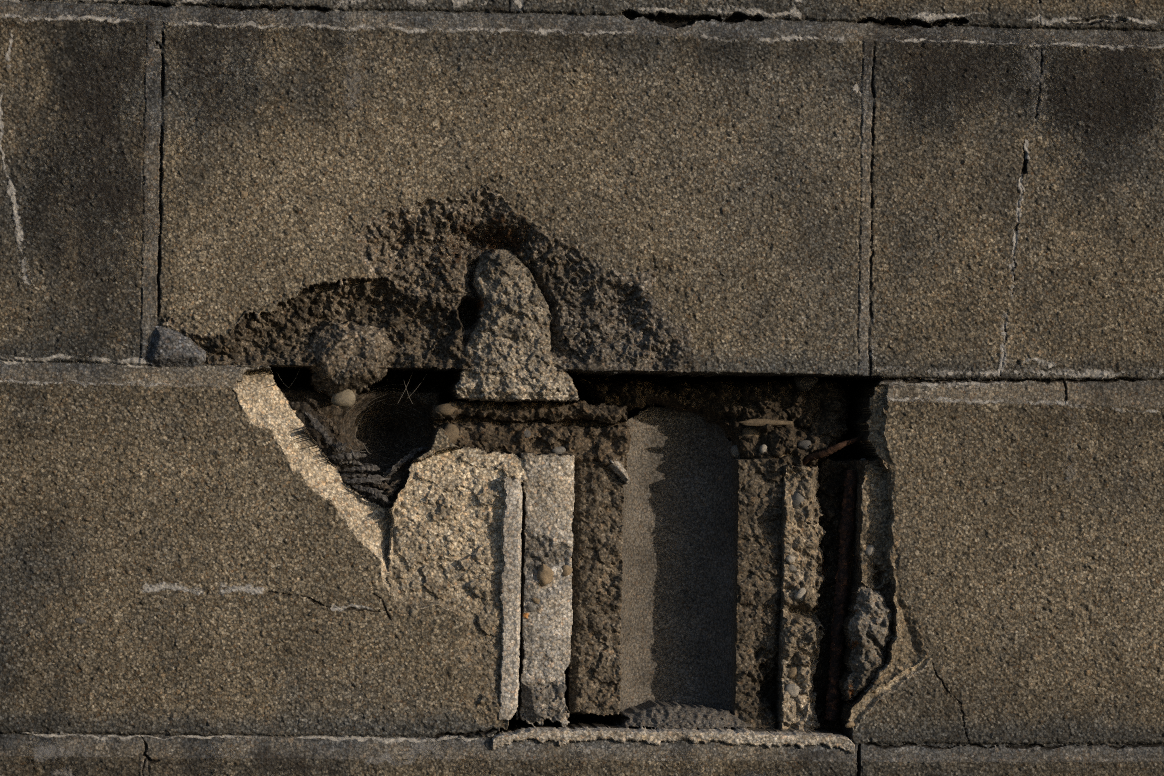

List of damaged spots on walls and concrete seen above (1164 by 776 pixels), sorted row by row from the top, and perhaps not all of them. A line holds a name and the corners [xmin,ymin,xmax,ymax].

crack [1035,0,1043,119]
crack [1000,145,1028,377]
spalling [162,183,700,739]
crack [268,591,392,620]